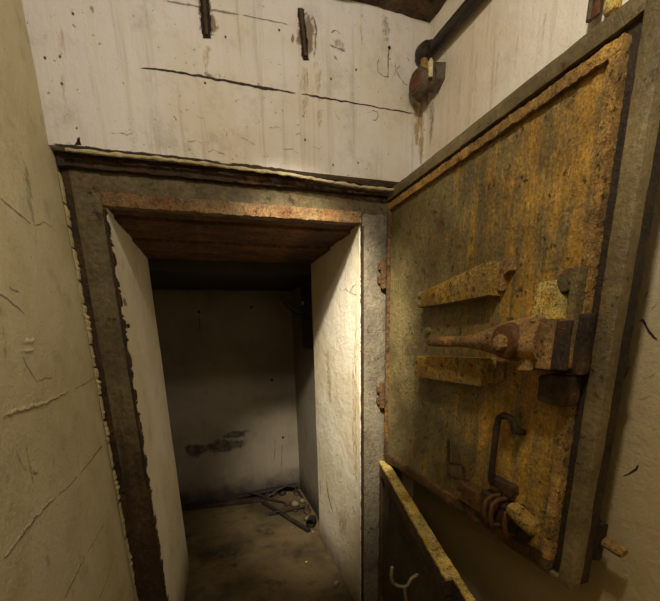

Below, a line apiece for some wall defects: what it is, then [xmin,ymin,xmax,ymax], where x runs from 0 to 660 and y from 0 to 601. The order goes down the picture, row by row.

crack [142,67,412,114]
rust [414,101,423,161]
crack [6,378,93,417]
flaking render [57,171,139,601]
peeling [184,430,249,458]
crack [1,447,101,560]